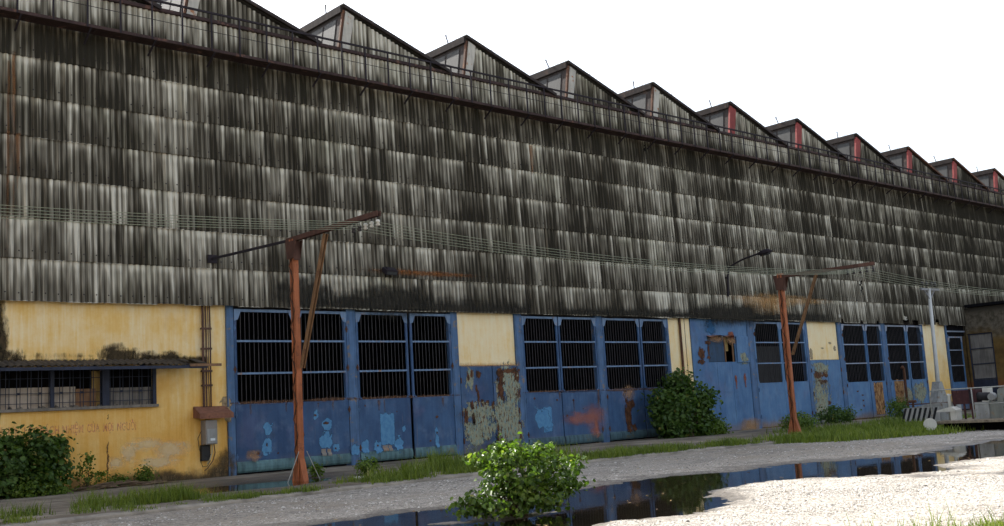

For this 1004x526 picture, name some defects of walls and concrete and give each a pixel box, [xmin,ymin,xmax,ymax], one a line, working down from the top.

water stain [0,300,81,368]
water stain [99,345,206,366]
peeling [257,422,279,456]
peeling [455,362,554,450]
peeling [809,342,836,423]